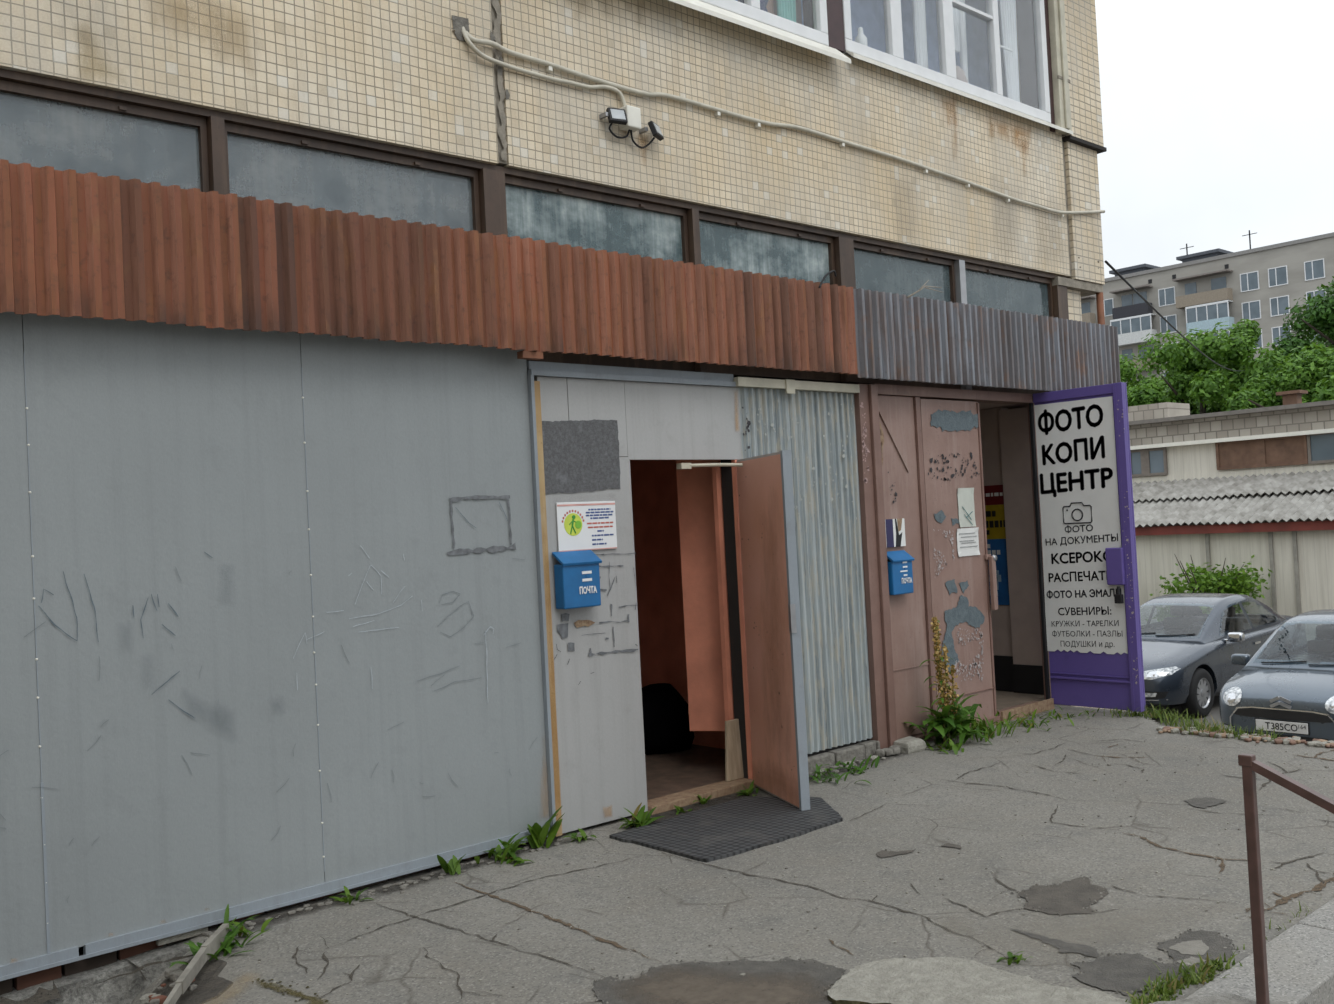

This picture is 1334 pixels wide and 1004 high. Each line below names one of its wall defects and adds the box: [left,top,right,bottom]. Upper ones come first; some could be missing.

peeling [928,452,980,481]
peeling [933,510,985,681]
crack [942,739,1334,918]
crack [292,852,1023,999]